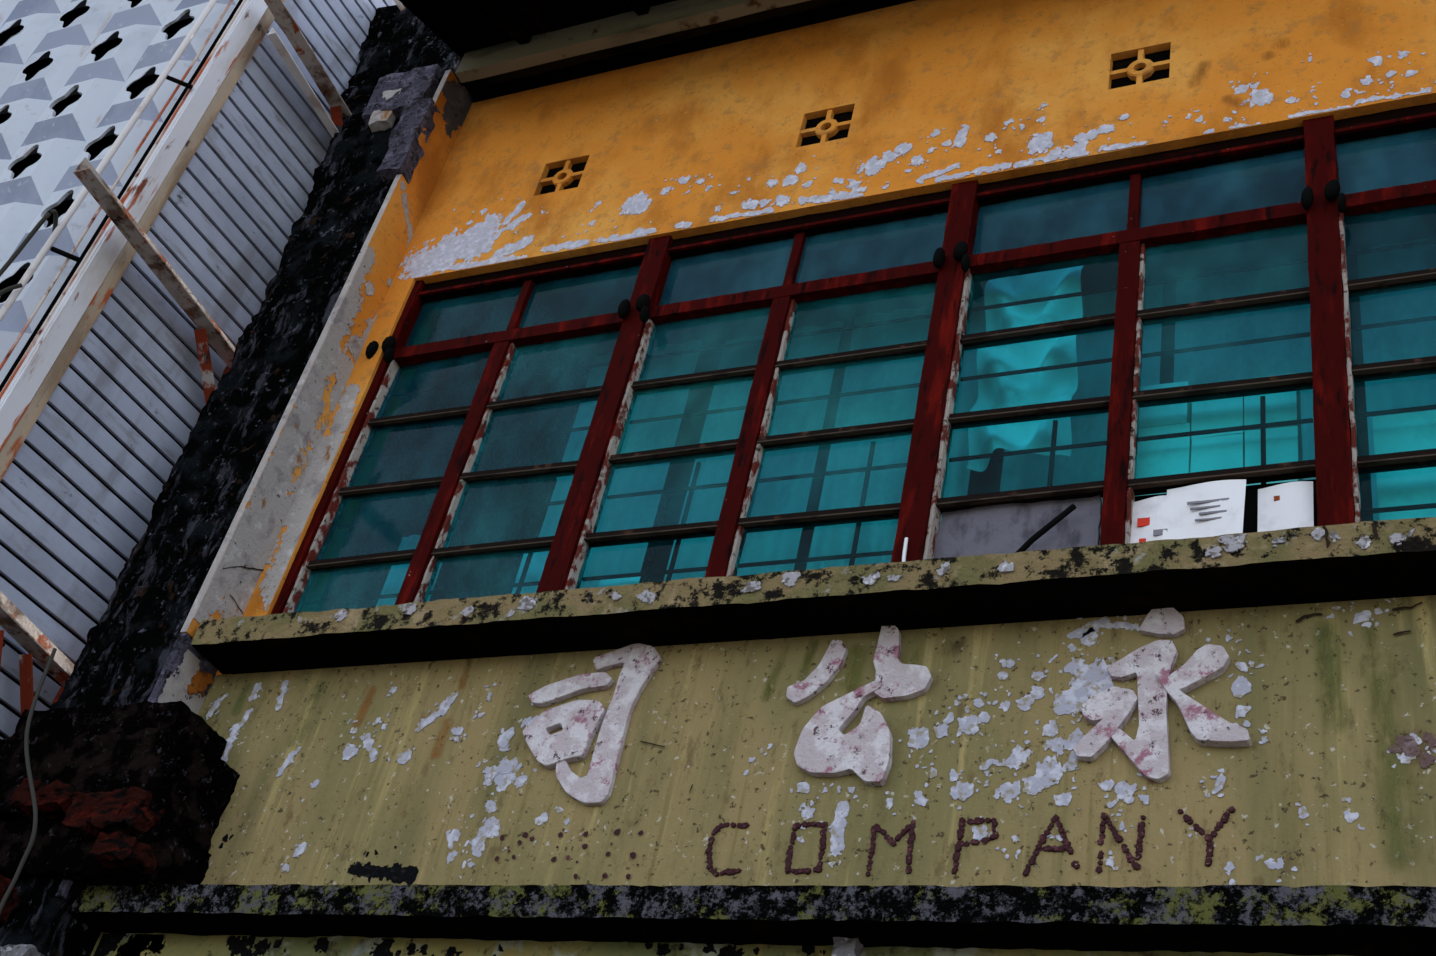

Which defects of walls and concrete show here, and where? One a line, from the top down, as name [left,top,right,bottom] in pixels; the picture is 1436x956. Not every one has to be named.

peeling [1162,51,1436,134]
peeling [193,64,1147,624]
peeling [1205,534,1248,559]
peeling [1311,528,1371,550]
peeling [1389,528,1415,546]
peeling [1326,599,1391,637]
peeling [1206,629,1268,745]
flaking render [1387,732,1436,769]
peeling [1200,768,1226,798]
peeling [1342,797,1365,830]
peeling [1223,861,1236,885]
peeling [1256,856,1298,883]